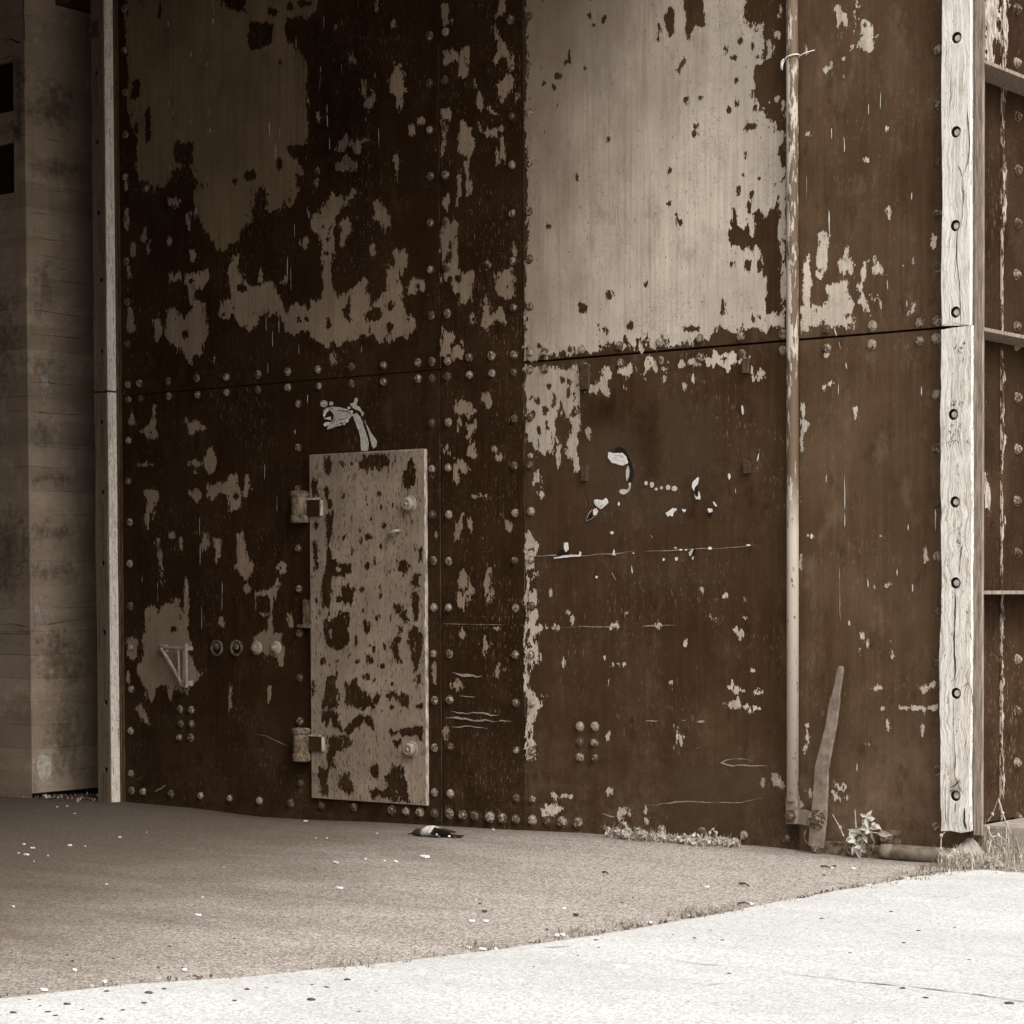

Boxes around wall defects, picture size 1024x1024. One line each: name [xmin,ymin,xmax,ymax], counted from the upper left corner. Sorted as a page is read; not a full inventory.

peeling [123,0,429,366]
peeling [439,0,786,485]
peeling [800,230,884,335]
peeling [143,489,183,587]
peeling [125,579,202,724]
peeling [201,533,222,563]
peeling [188,446,253,512]
peeling [234,531,294,667]
peeling [454,512,483,542]
peeling [455,567,495,612]
peeling [532,469,544,499]
peeling [523,530,575,761]